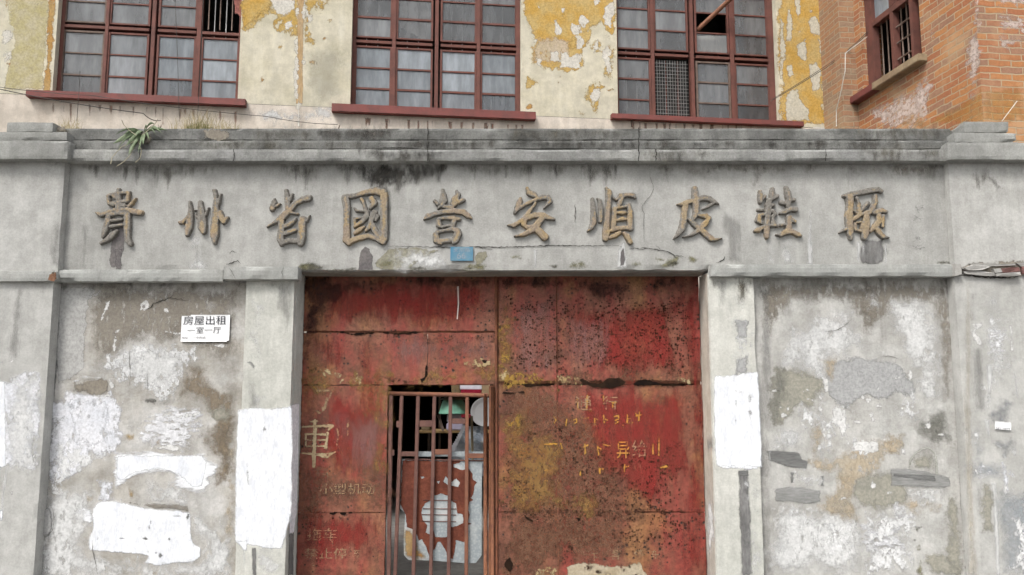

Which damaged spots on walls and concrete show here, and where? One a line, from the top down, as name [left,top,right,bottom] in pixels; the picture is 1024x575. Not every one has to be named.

peeling [1,0,55,90]
peeling [240,0,328,45]
peeling [523,0,616,112]
peeling [777,0,824,124]
spalling [42,287,247,575]
rust [304,276,350,333]
rust [464,277,695,574]
peeling [777,312,886,468]
leakage [763,282,951,386]
peeling [891,301,940,419]
peeling [774,482,917,575]